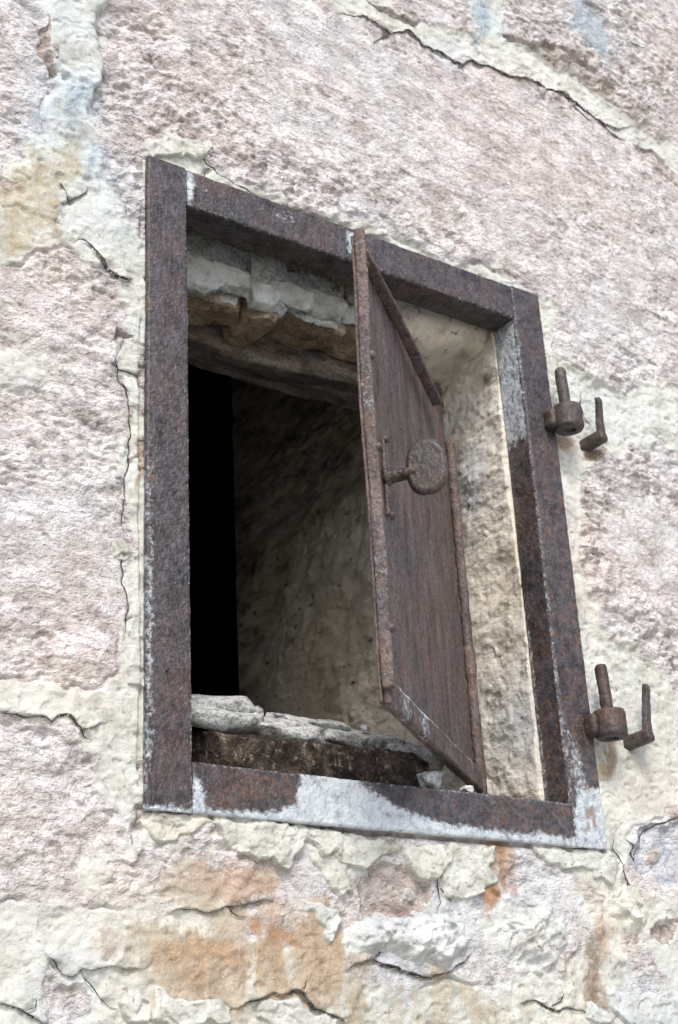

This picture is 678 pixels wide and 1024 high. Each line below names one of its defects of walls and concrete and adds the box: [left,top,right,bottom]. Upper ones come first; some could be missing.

crack [336,13,633,140]
crack [76,239,131,281]
crack [111,339,141,531]
rust [585,447,607,461]
crack [120,560,131,638]
crack [0,712,107,740]
crack [612,818,677,887]
crack [166,899,272,917]
crack [50,958,153,1009]
crack [343,952,470,979]